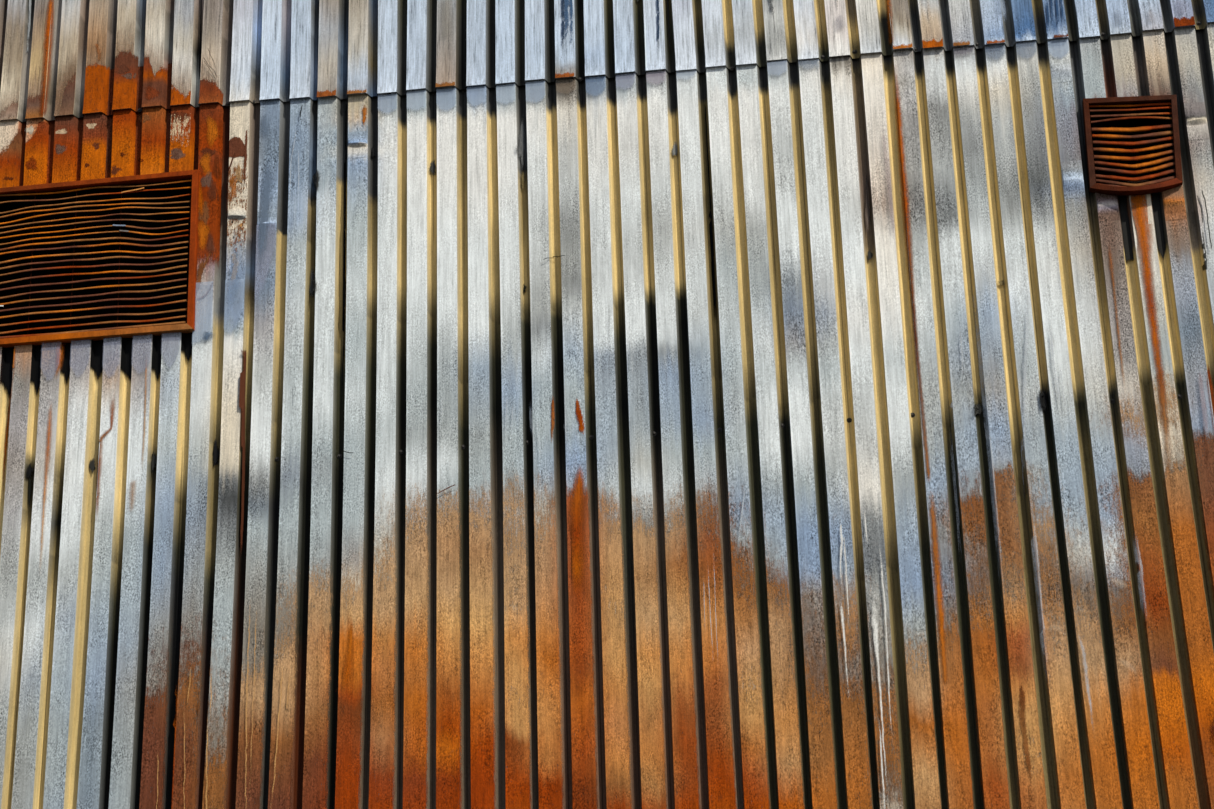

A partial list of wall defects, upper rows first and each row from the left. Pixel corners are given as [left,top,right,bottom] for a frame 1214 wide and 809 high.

corrosion [0,0,224,264]
corrosion [895,85,930,479]
corrosion [885,0,970,49]
corrosion [139,194,1214,809]